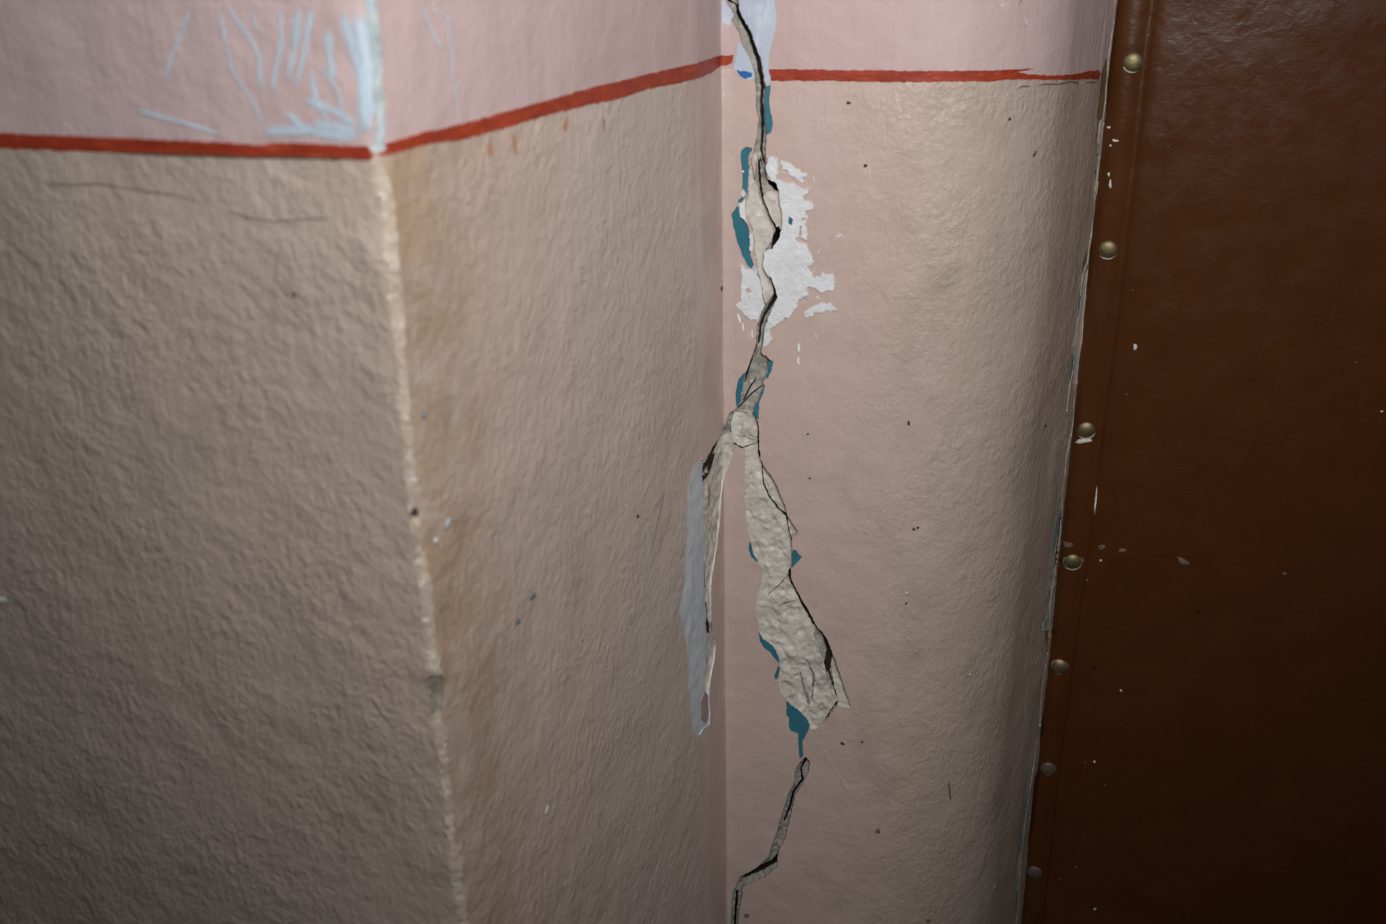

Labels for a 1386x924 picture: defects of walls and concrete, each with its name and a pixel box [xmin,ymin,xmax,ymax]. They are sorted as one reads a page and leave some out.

peeling [722,0,777,134]
peeling [732,147,758,273]
crack [726,0,782,426]
flaking render [679,361,851,758]
crack [731,757,810,924]